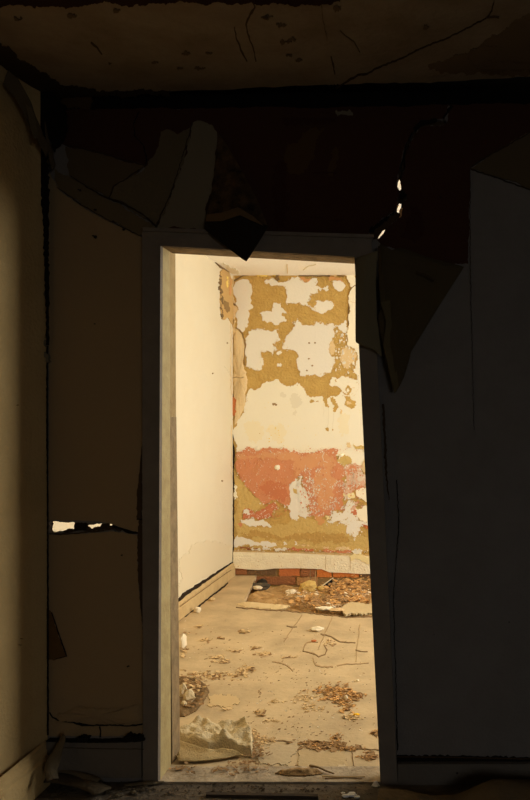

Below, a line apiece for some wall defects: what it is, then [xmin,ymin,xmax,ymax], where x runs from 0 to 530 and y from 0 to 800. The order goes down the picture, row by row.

crack [331,2,499,89]
flaking render [40,92,530,264]
spalling [310,385,356,414]
flaking render [233,475,369,566]